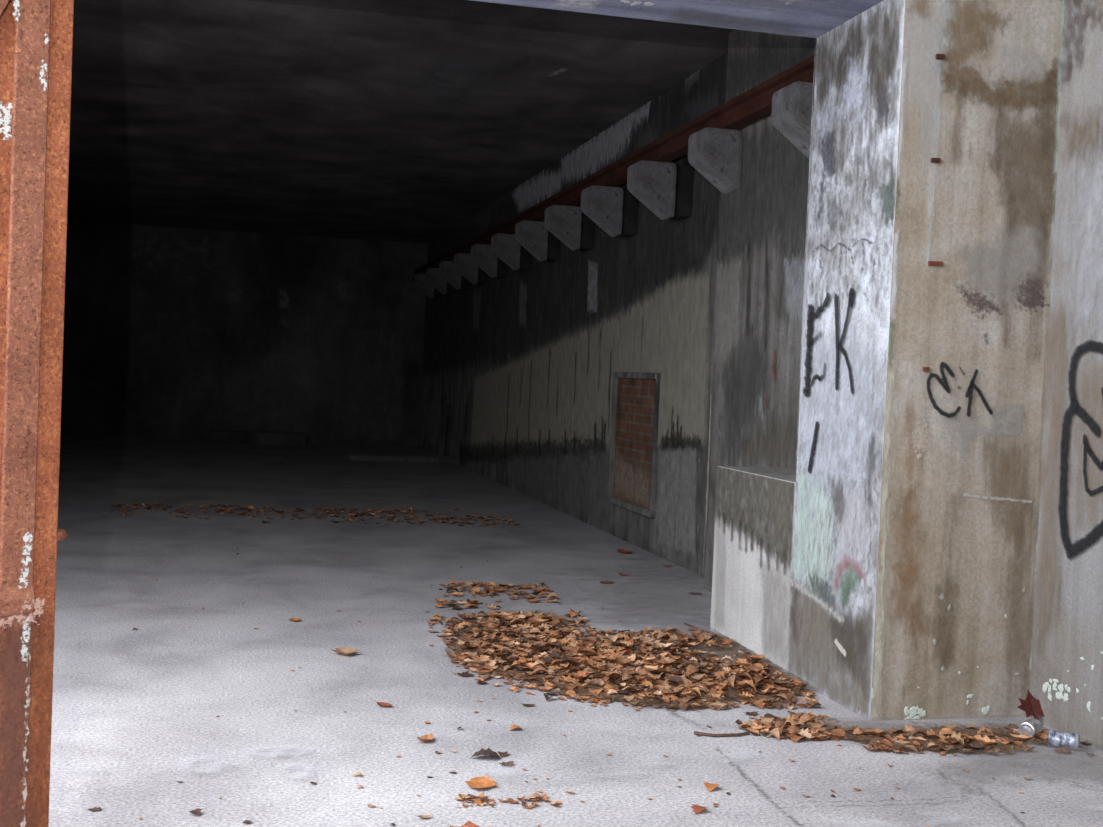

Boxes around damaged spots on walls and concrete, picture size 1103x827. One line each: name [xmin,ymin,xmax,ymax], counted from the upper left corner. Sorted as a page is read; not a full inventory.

leakage [857,23,892,123]
leakage [904,0,1100,242]
leakage [880,180,895,226]
leakage [662,128,841,523]
leakage [459,363,611,462]
leakage [723,473,871,717]
crack [717,747,1025,826]